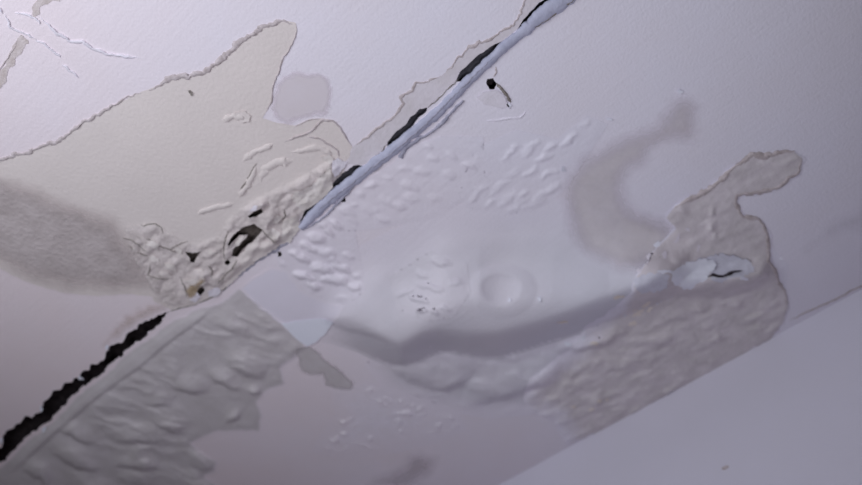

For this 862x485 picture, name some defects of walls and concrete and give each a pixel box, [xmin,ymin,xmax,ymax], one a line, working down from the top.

crack [0,0,139,88]
water stain [0,185,143,285]
peeling [0,0,540,310]
crack [333,42,500,187]
crack [519,0,548,27]
water stain [570,107,690,264]
peeling [523,150,806,445]
crack [0,293,221,462]